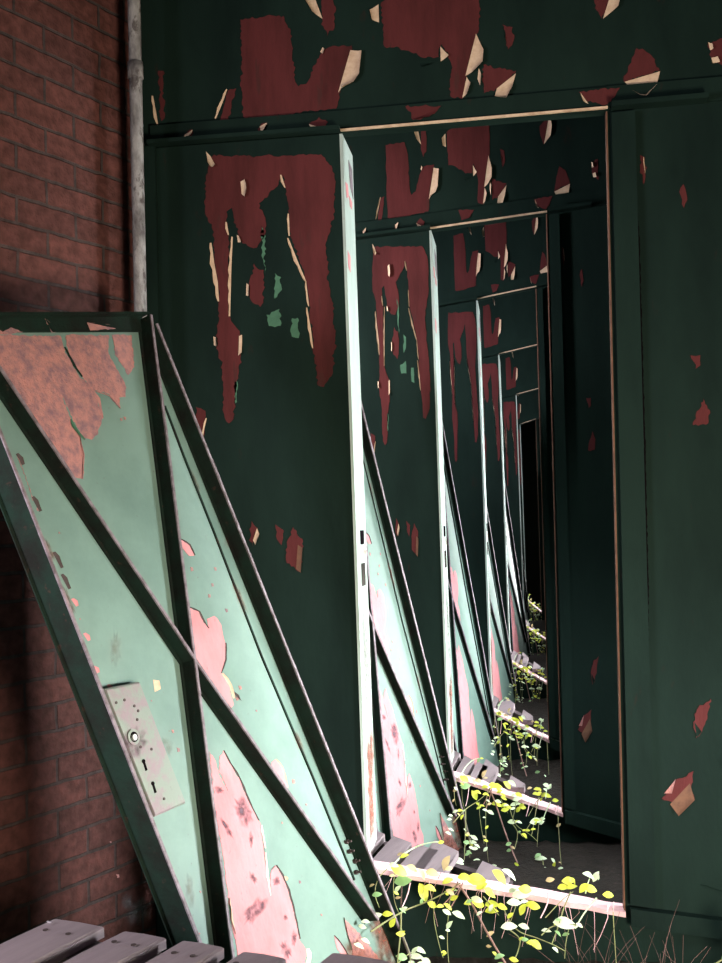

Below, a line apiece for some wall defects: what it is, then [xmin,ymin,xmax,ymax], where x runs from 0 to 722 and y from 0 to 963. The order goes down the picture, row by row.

peeling [215,15,361,131]
peeling [370,0,516,99]
peeling [594,0,620,19]
peeling [579,48,660,106]
peeling [204,152,354,423]
peeling [371,105,521,486]
peeling [366,532,400,660]
peeling [190,607,242,708]
peeling [376,688,424,848]
peeling [662,771,695,816]
peeling [210,750,312,963]
corrosion [349,920,390,960]